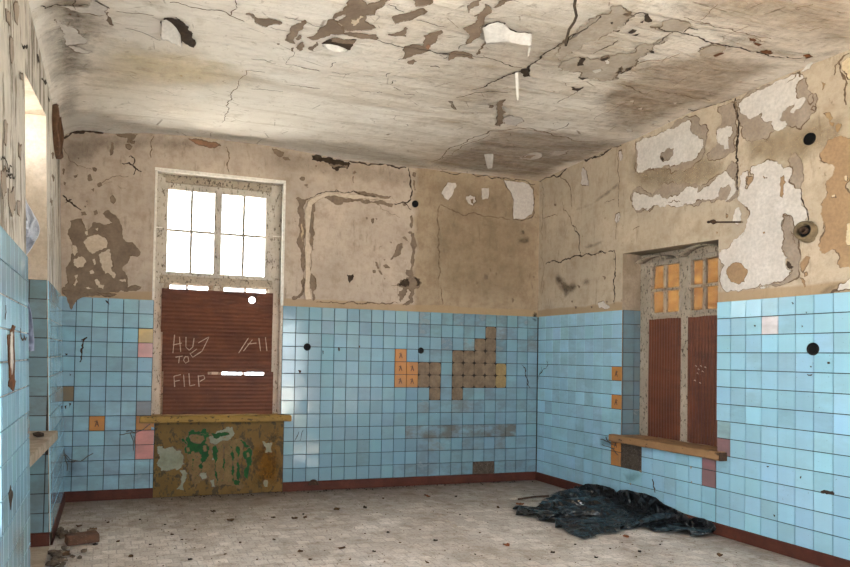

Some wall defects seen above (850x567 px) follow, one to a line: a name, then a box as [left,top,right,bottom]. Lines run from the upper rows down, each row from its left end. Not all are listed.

crack [43,0,158,40]
crack [170,0,243,21]
peeling [246,0,390,53]
peeling [388,0,443,65]
crack [358,16,601,98]
peeling [448,0,532,61]
crack [593,4,811,190]
crack [63,130,154,184]
peeling [626,54,850,293]
crack [433,123,640,302]
peeling [62,195,141,310]
peeling [451,327,506,400]